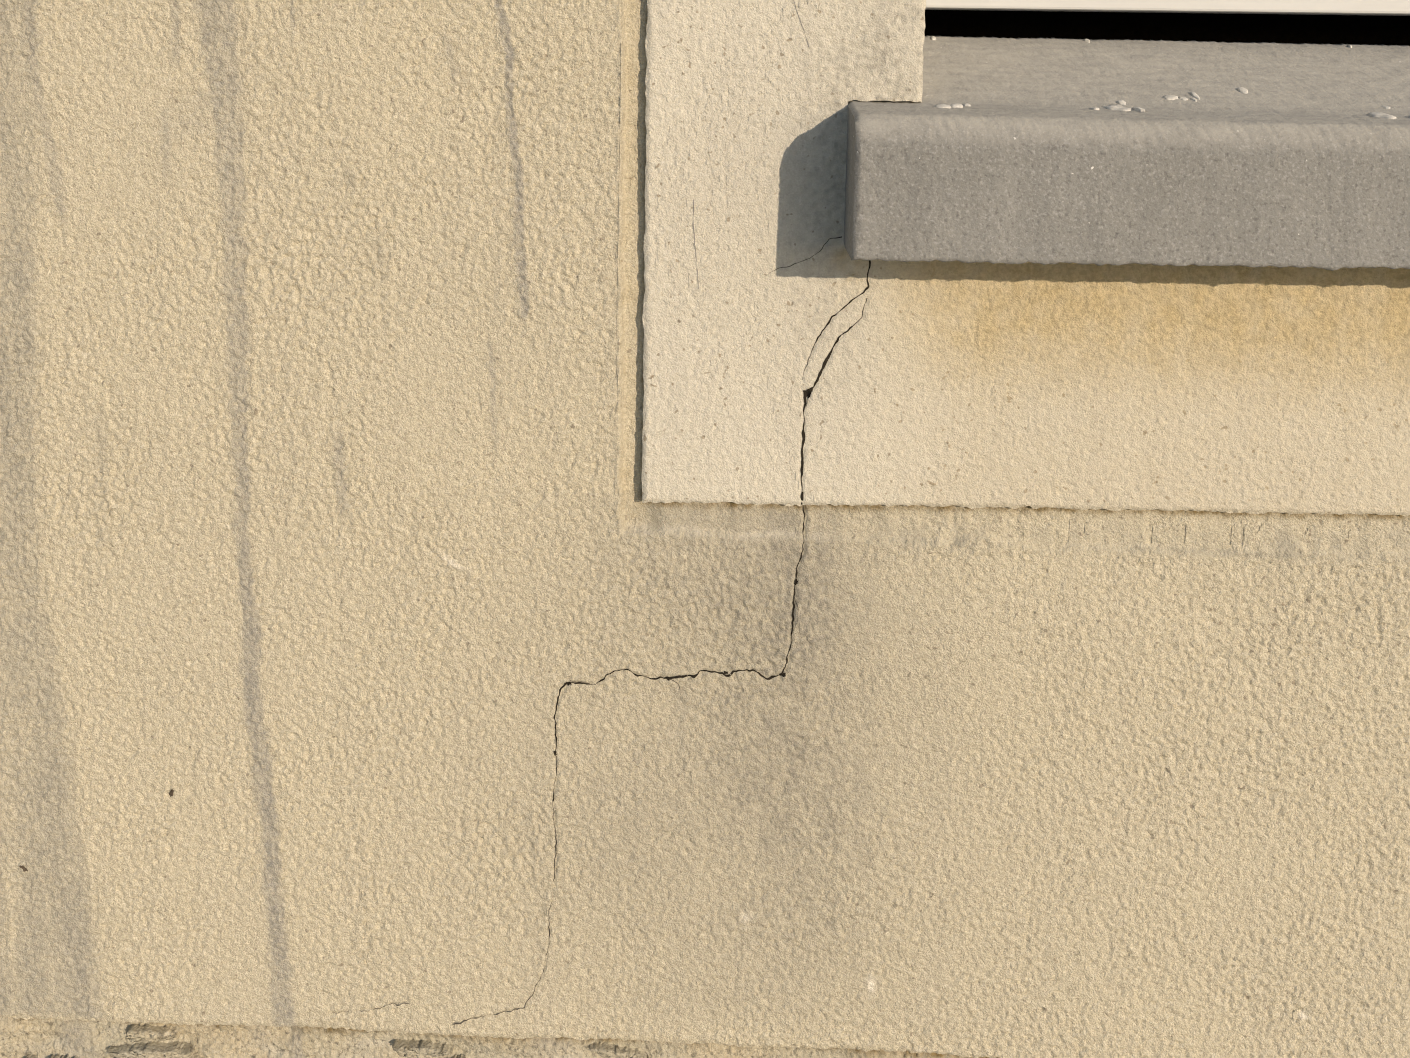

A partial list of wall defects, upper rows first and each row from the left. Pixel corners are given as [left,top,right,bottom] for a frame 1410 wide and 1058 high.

damp [0,0,113,1058]
damp [157,0,310,1058]
damp [491,0,532,325]
crack [453,260,871,1025]
crack [770,236,842,273]